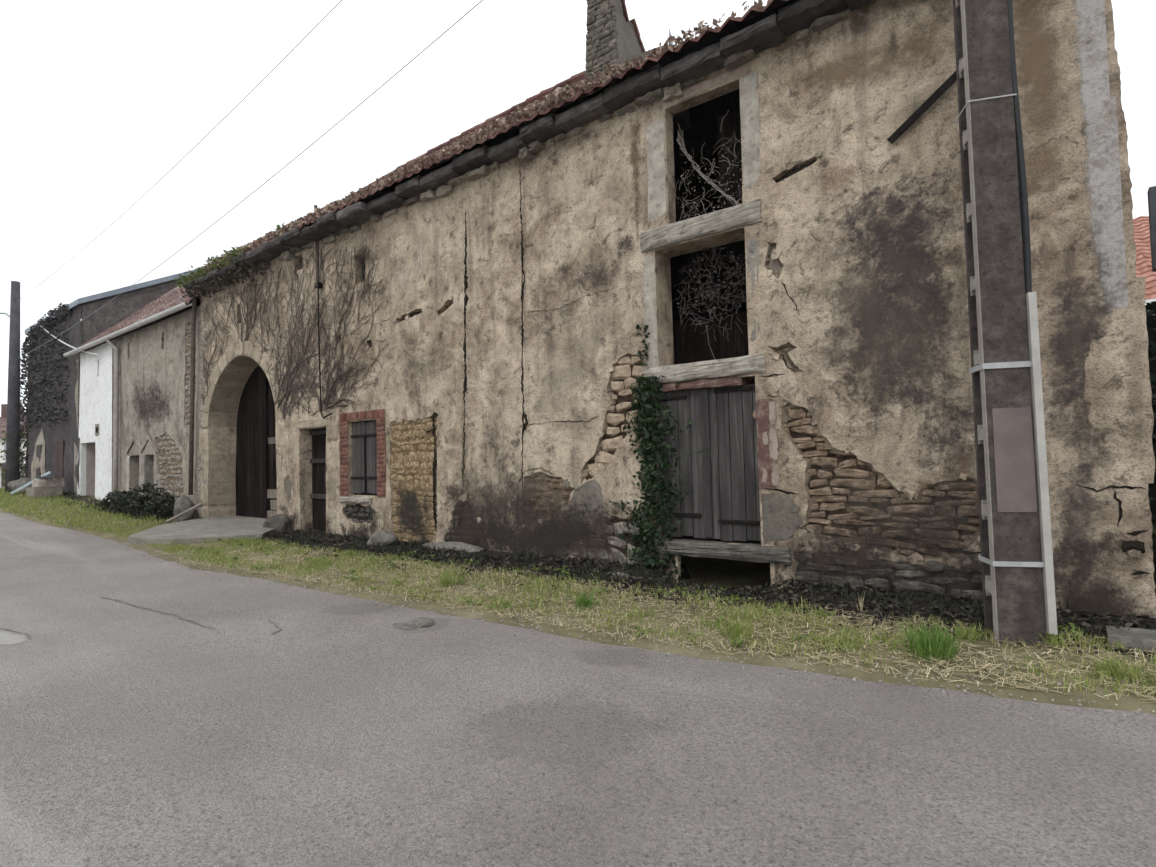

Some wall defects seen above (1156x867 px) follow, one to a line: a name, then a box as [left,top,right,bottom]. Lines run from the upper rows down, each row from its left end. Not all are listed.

crack [426,210,469,529]
crack [517,161,614,521]
flaking render [521,353,644,528]
flaking render [753,400,983,601]
damp [830,172,974,469]
crack [1077,484,1149,536]